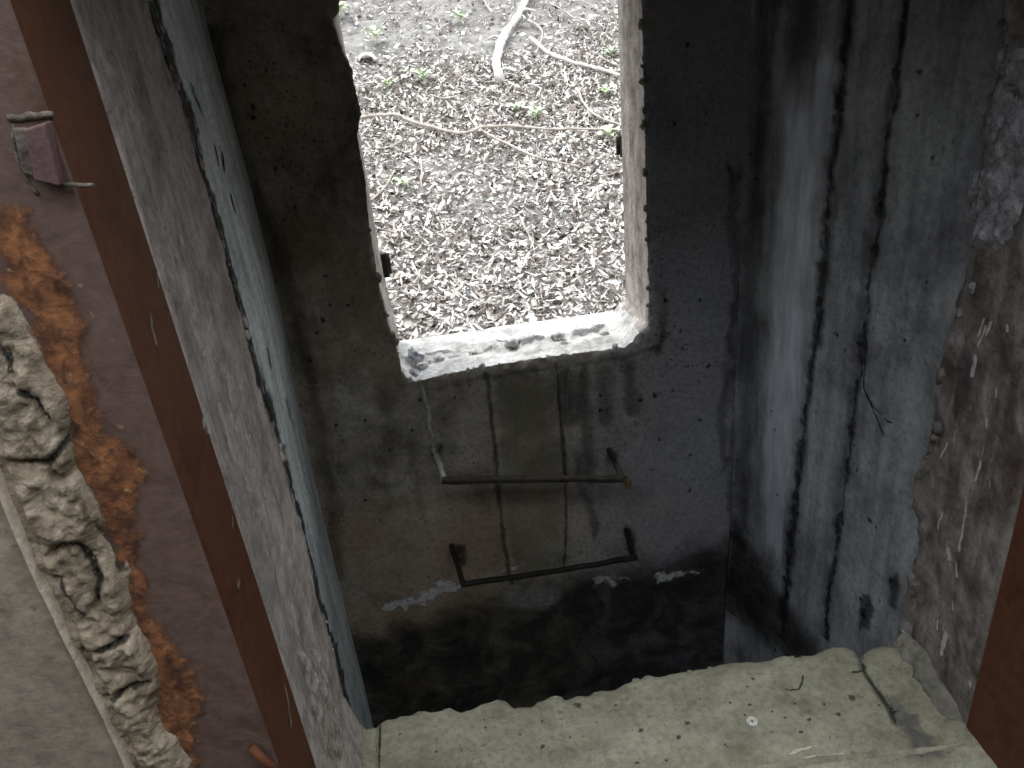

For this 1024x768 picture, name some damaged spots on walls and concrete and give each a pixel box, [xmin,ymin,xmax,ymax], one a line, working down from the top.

rust [0,205,204,768]
damp [353,529,810,728]
crack [779,0,853,641]
crack [824,0,908,641]
spalling [968,18,1024,251]